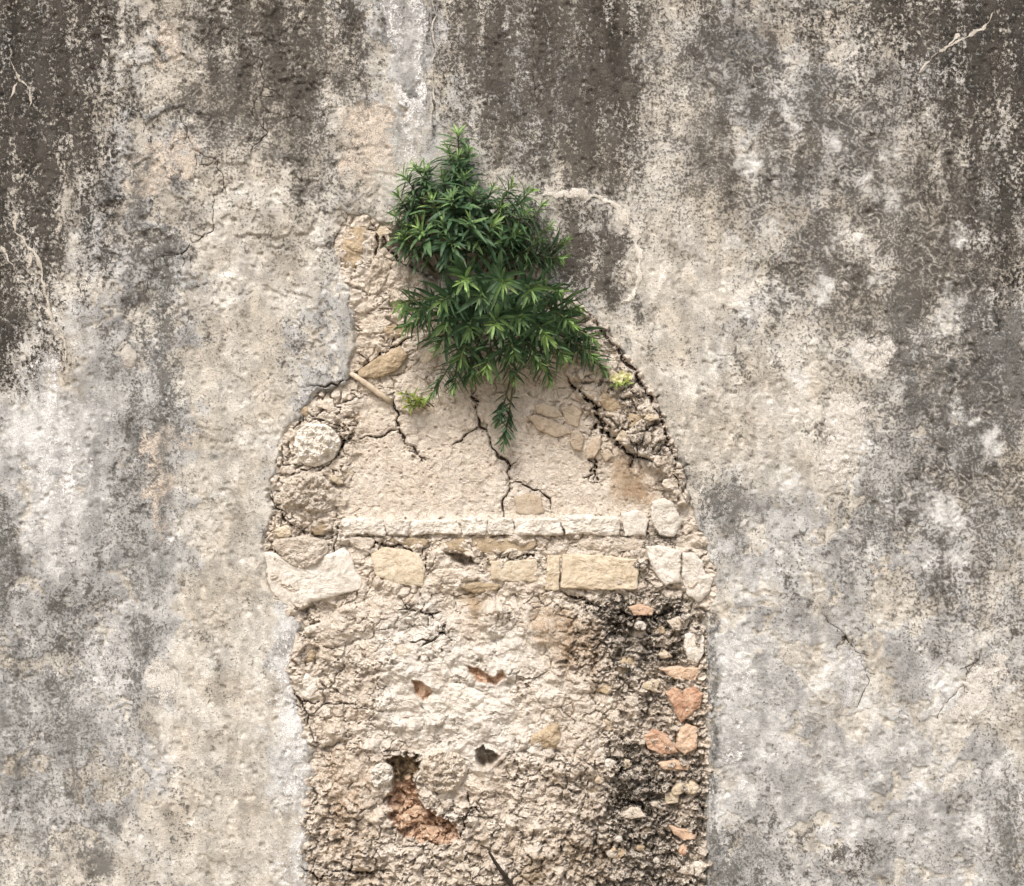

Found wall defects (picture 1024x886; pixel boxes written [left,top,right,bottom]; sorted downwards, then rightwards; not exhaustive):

water stain [0,0,205,886]
flaking render [267,389,364,542]
crack [307,336,413,388]
crack [294,401,426,473]
crack [453,386,551,514]
flaking render [335,202,690,510]
water stain [151,0,1024,616]
crack [567,312,686,489]
spalling [382,751,465,852]
spalling [475,745,500,772]
spalling [563,598,713,886]
water stain [573,520,772,886]